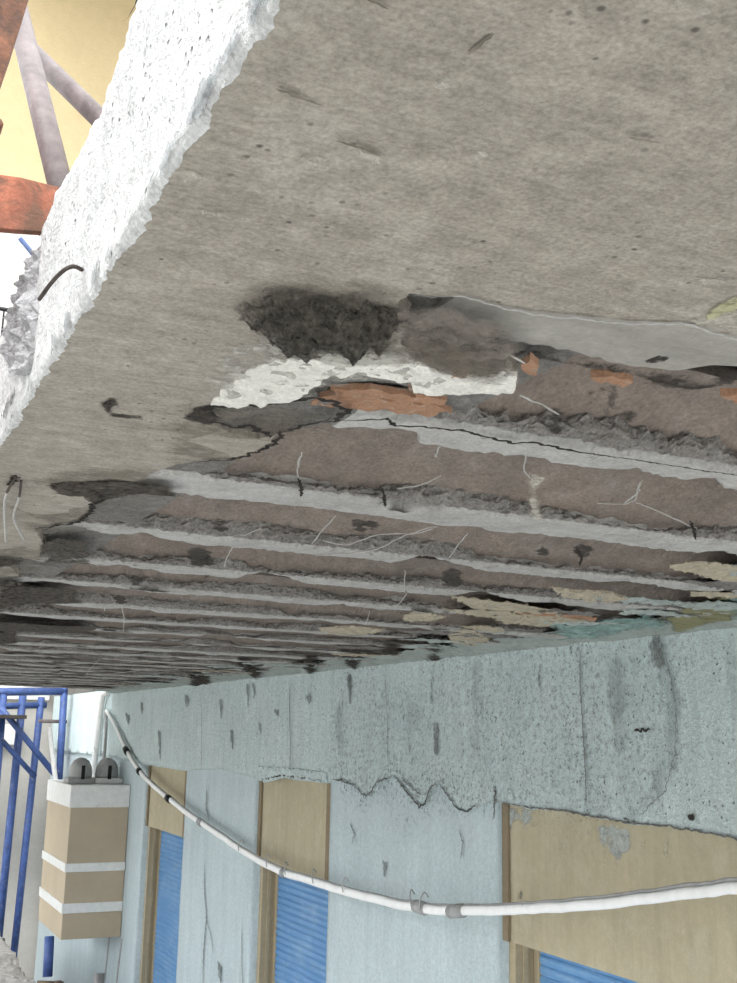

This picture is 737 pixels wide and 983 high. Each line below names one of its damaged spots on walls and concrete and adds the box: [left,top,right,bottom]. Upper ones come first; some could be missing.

spalling [0,246,109,391]
water stain [236,290,734,390]
spalling [209,339,539,431]
crack [198,397,737,476]
spalling [50,481,177,502]
crack [296,478,304,497]
crack [379,485,387,506]
peeling [550,586,628,603]
peeling [669,561,737,582]
spalling [0,623,101,644]
peeling [448,595,737,669]
crack [333,639,737,841]